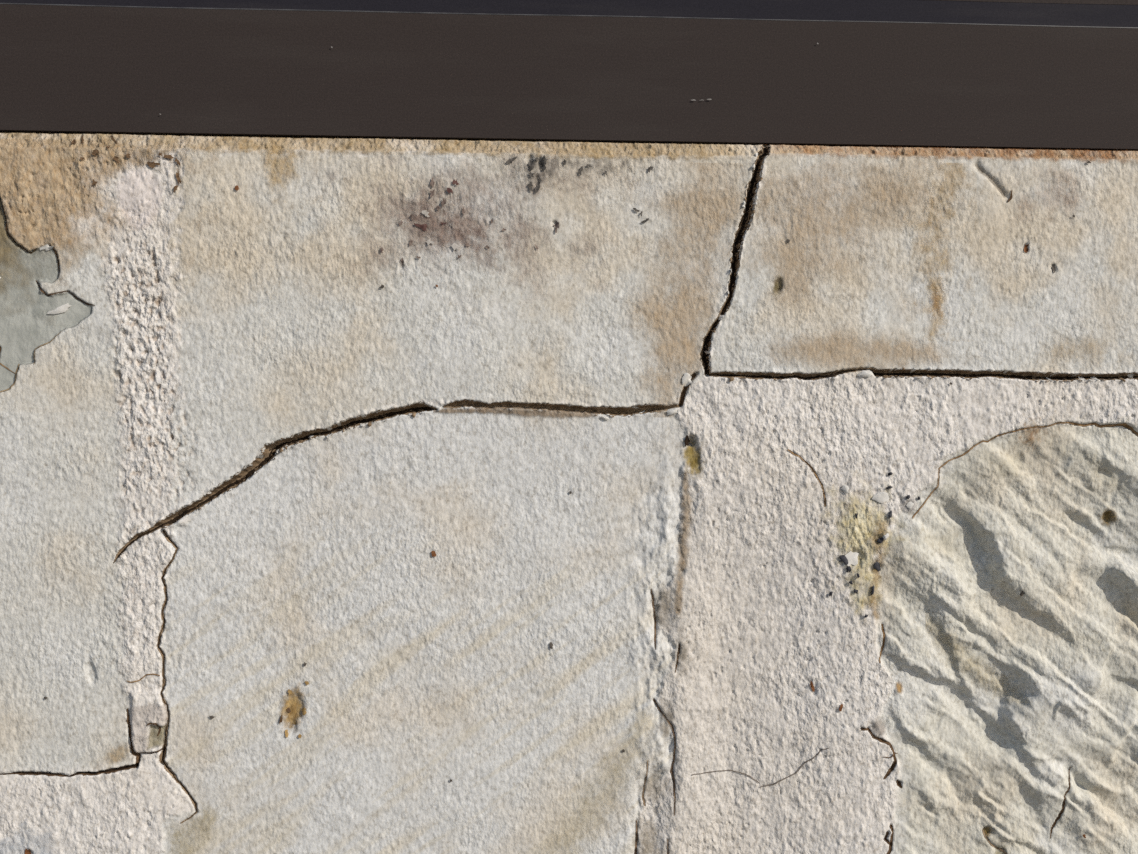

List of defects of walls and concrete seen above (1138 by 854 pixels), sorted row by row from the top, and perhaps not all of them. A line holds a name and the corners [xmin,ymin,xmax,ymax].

leakage [392,178,538,266]
leakage [762,176,908,288]
peeling [0,198,95,392]
crack [0,147,1138,824]
crack [1050,767,1071,839]